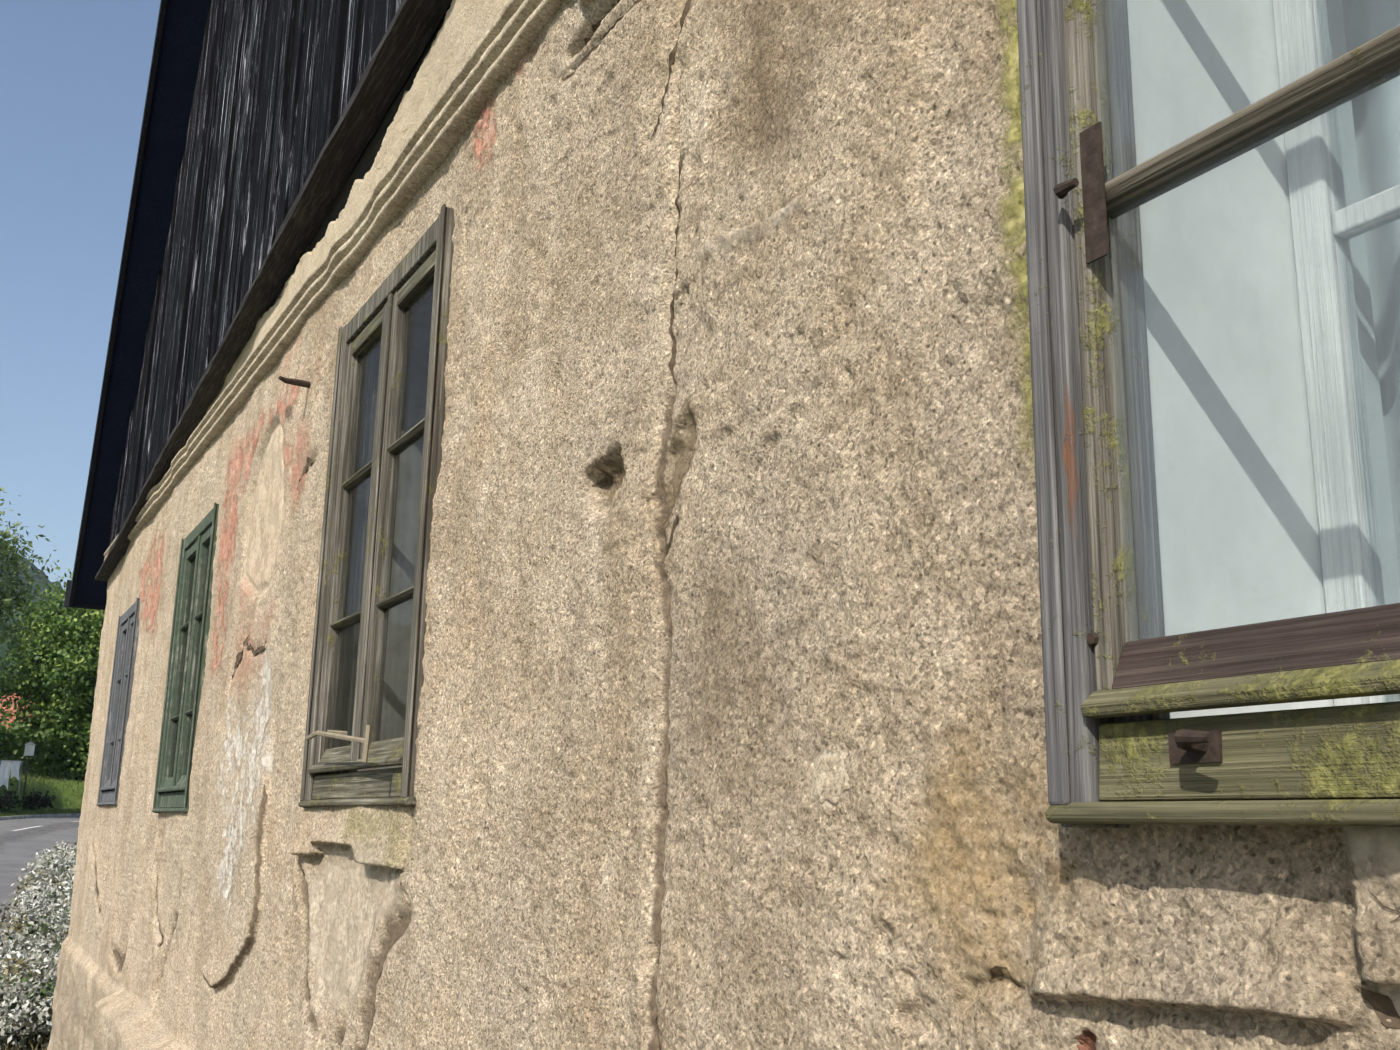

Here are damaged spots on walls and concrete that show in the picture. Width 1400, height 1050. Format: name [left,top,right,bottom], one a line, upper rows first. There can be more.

flaking render [564,0,640,81]
flaking render [592,454,626,521]
crack [649,0,692,1050]
crack [1369,892,1400,923]
flaking render [1077,1030,1097,1050]